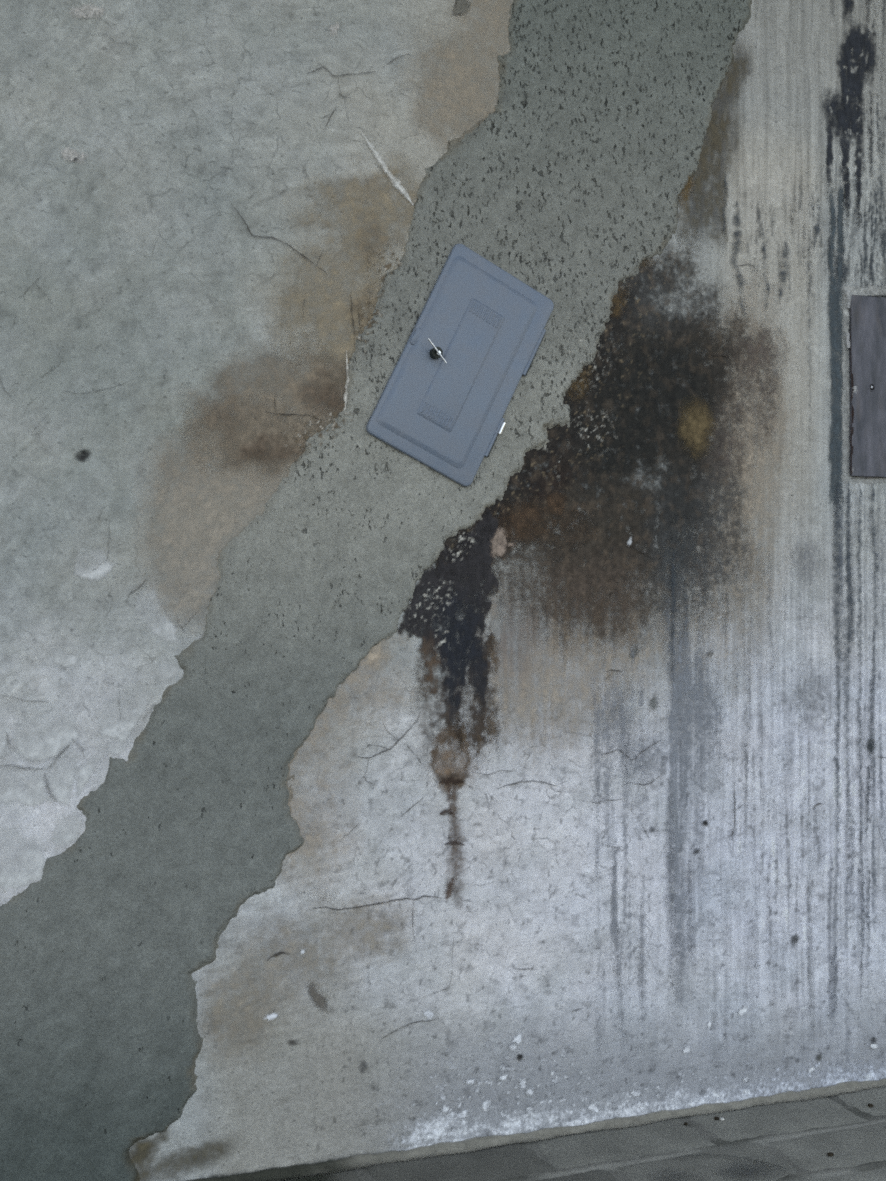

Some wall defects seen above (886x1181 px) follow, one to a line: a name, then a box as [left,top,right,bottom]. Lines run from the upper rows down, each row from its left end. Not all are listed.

water stain [156,170,417,611]
water stain [810,0,886,743]
peeling [76,558,113,580]
peeling [150,617,178,642]
peeling [491,528,513,557]
water stain [398,251,784,964]
peeling [0,696,149,805]
peeling [0,848,44,890]
water stain [836,755,883,937]
spalling [310,986,325,1009]